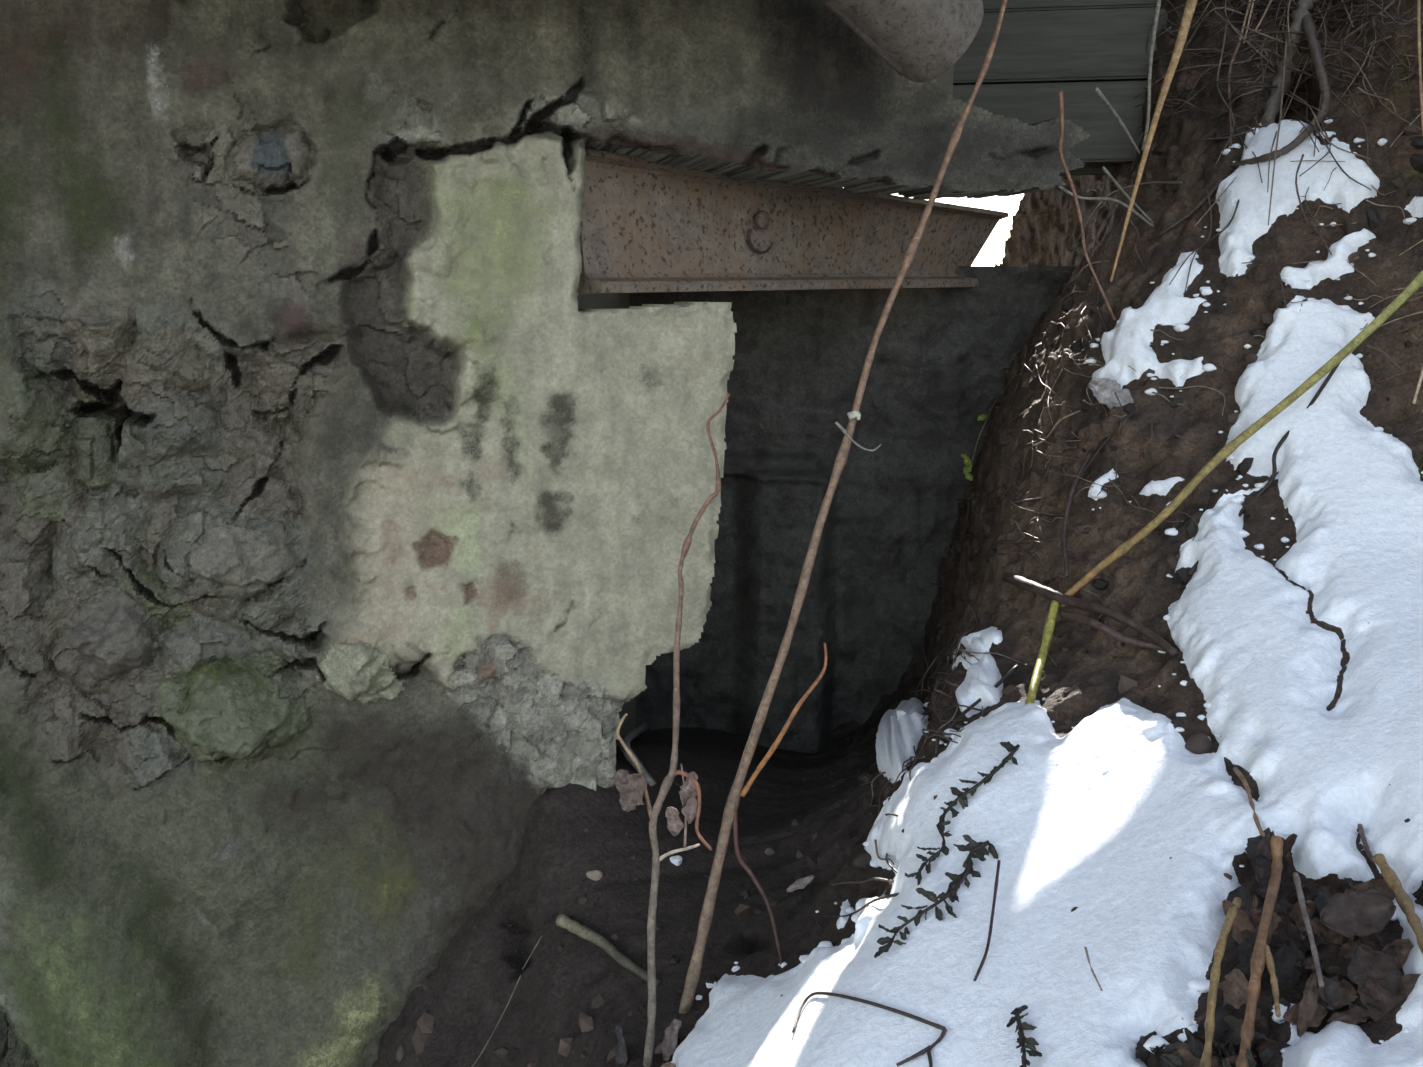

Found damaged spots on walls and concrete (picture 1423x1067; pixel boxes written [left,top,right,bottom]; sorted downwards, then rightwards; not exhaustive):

crack [181,138,217,174]
crack [241,182,305,195]
crack [328,80,681,282]
crack [745,146,893,185]
spalling [0,97,461,797]
spalling [440,633,634,795]